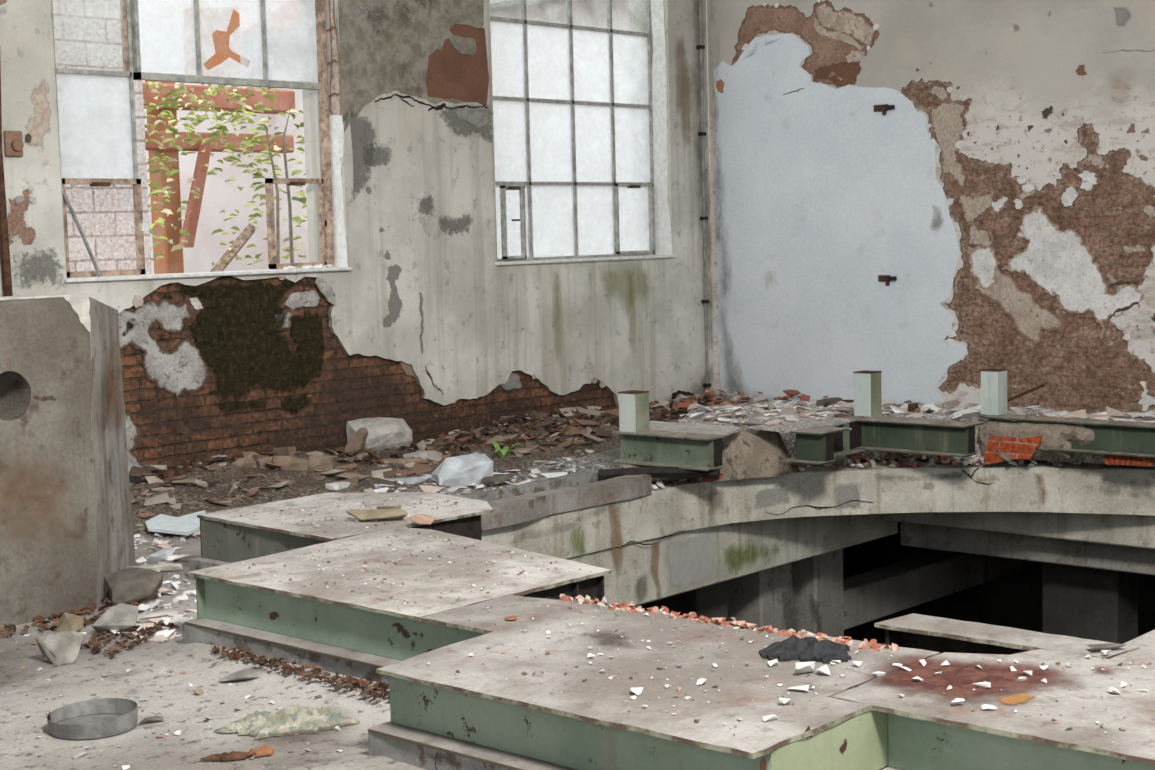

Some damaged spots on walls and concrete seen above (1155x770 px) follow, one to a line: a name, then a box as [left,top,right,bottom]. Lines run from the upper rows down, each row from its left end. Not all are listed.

peeling [426,24,489,106]
crack [374,94,489,128]
peeling [7,189,37,263]
peeling [714,0,1155,414]
peeling [383,251,403,327]
flaking render [118,273,619,487]
crack [766,500,873,515]